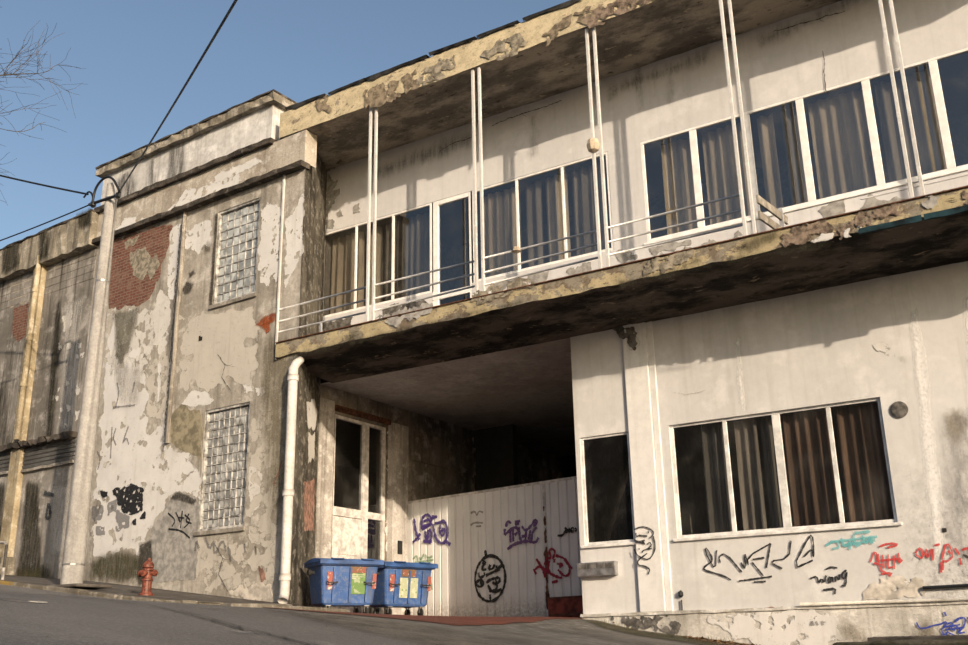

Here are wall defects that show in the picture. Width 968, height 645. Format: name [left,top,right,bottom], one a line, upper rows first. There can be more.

spalling [542,0,651,46]
spalling [363,55,456,108]
peeling [168,158,262,211]
spalling [781,194,905,248]
spalling [616,239,720,278]
spalling [470,271,549,307]
water stain [46,300,82,437]
peeling [92,217,283,601]
water stain [912,324,968,567]
water stain [17,482,40,576]
spalling [611,615,681,636]
peeling [706,609,848,645]